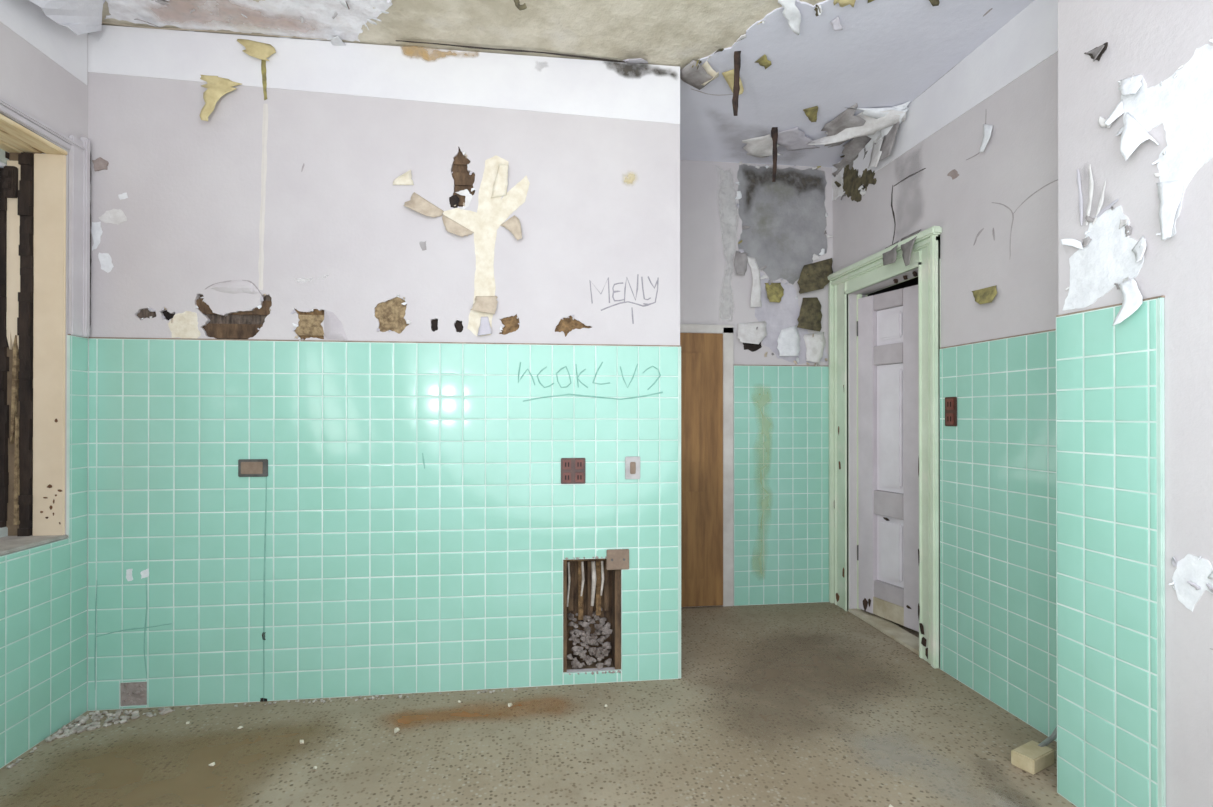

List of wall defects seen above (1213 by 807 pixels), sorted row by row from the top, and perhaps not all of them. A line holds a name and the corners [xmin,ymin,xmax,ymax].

flaking render [29,0,874,121]
peeling [1060,39,1213,326]
peeling [393,148,530,336]
water stain [720,170,822,319]
flaking render [734,101,910,366]
flaking render [137,294,272,339]
flaking render [291,309,324,341]
flaking render [374,294,411,334]
flaking render [555,314,592,337]
peeling [972,285,997,304]
peeling [1168,554,1213,612]
rust [395,703,526,725]